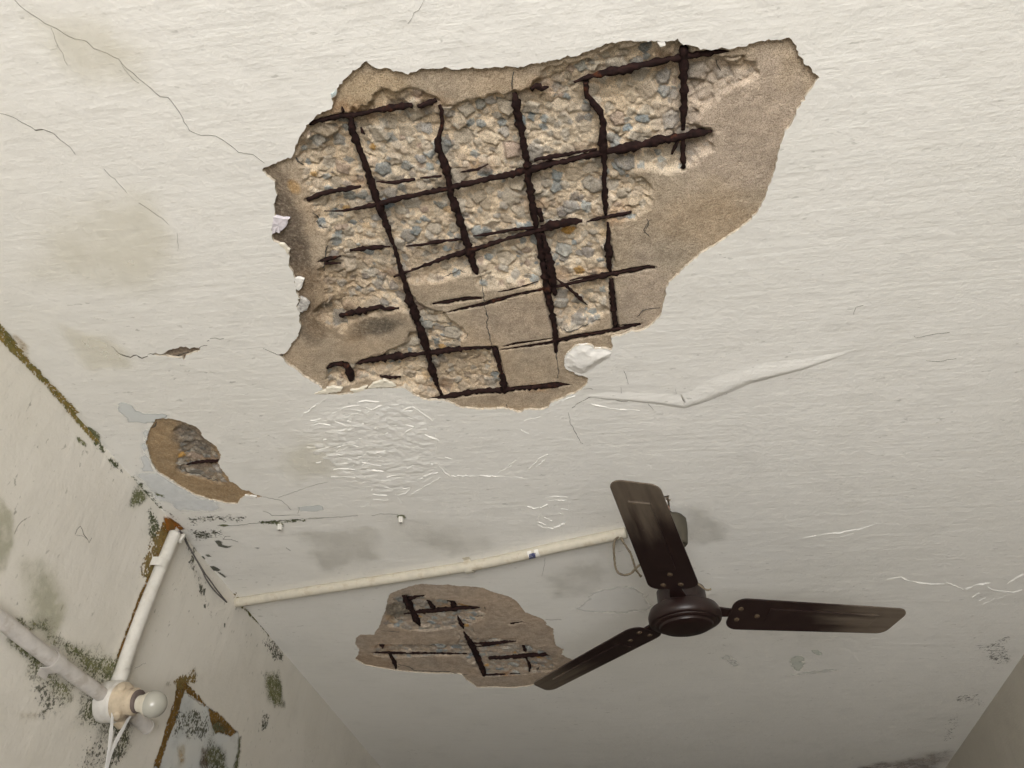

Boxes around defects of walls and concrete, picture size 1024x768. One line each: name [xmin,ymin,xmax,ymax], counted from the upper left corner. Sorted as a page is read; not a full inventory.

crack [15,0,264,163]
spalling [263,38,818,411]
spalling [118,403,260,503]
water stain [17,618,119,683]
water stain [9,639,130,768]
spalling [356,584,572,687]